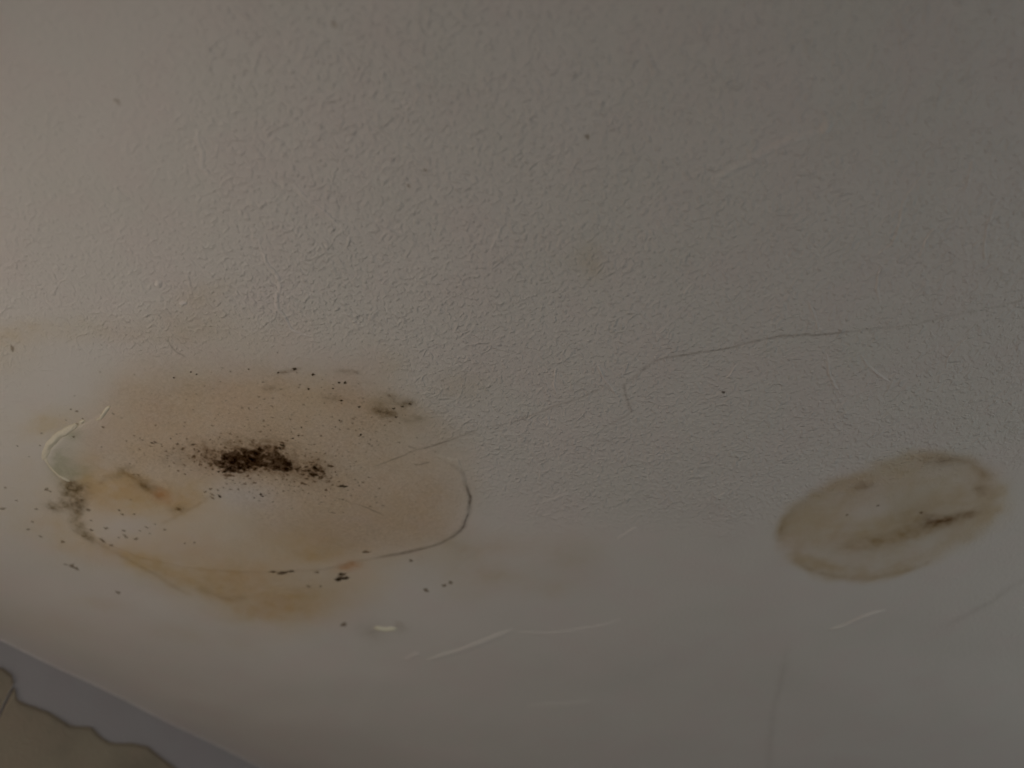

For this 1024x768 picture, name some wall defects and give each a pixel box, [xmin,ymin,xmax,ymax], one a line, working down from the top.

damp [214,427,302,476]